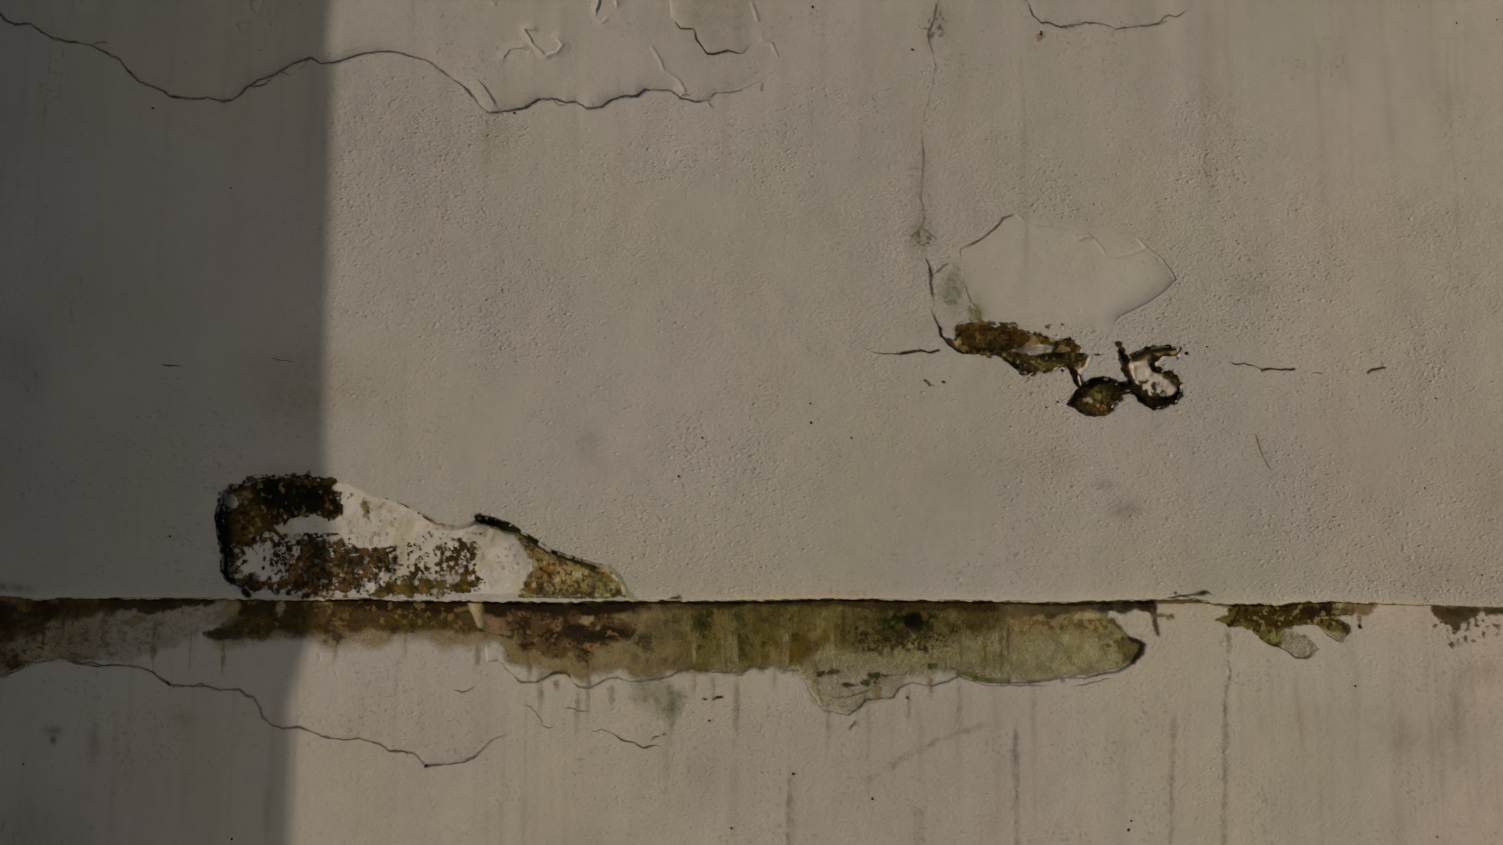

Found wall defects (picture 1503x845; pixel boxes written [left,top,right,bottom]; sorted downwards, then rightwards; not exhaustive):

crack [0,13,762,113]
crack [1026,0,1184,29]
crack [872,139,1012,355]
spalling [937,319,1185,420]
spalling [212,471,635,600]
damp [0,596,215,677]
crack [3,657,491,768]
peeling [8,635,683,766]
damp [475,601,684,723]
peeling [785,640,1130,716]
damp [1137,600,1173,636]
damp [1431,605,1503,648]